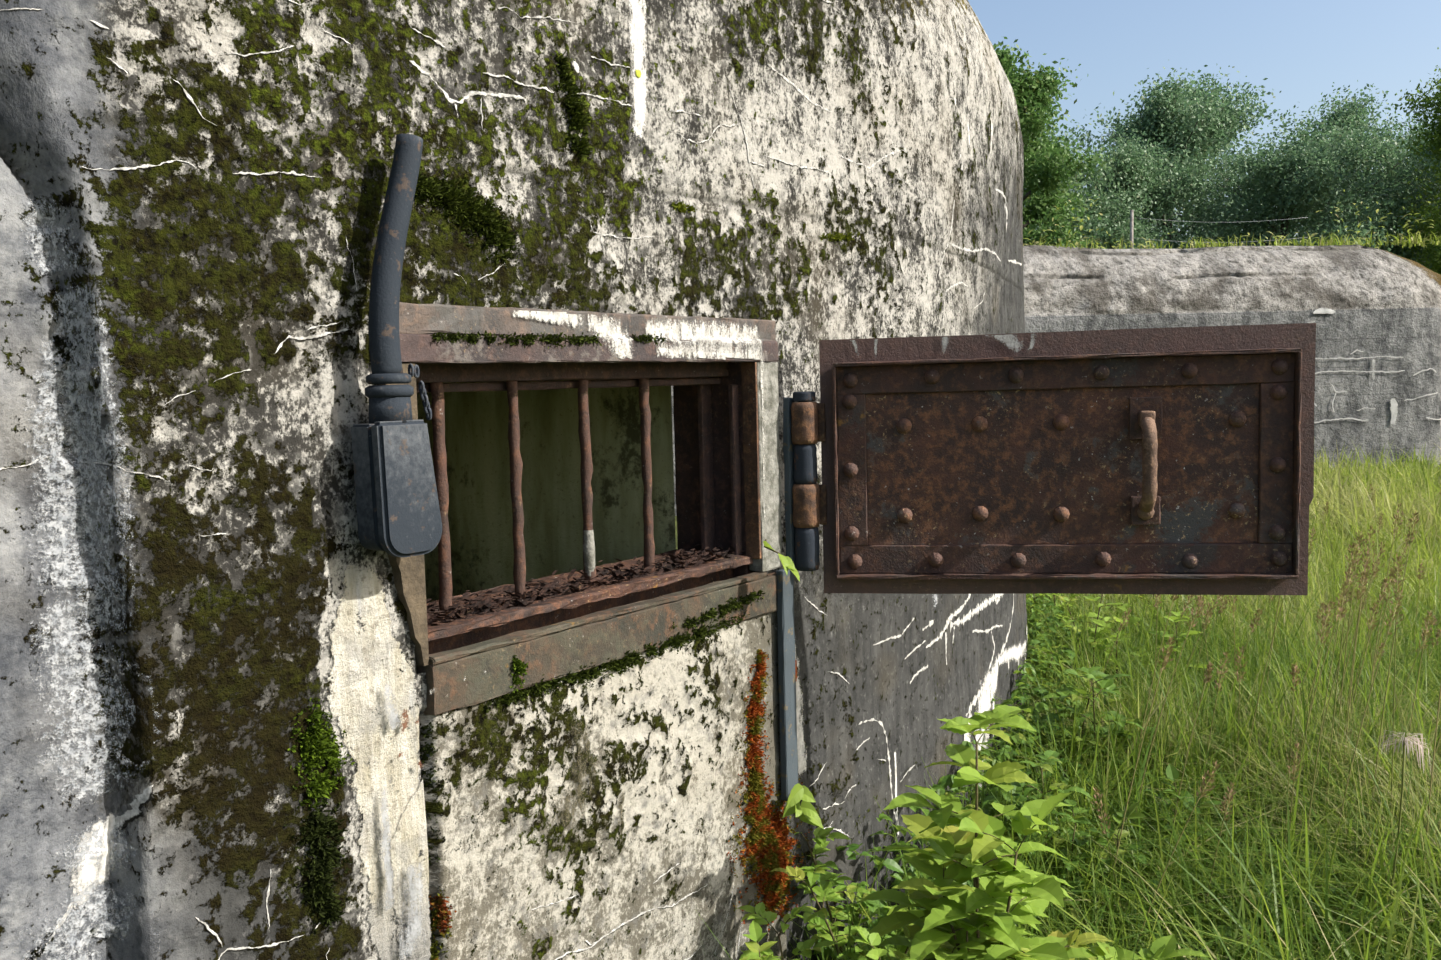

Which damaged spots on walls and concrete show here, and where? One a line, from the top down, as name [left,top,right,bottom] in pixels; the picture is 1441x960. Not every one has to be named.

crack [410,28,632,127]
water stain [629,0,648,138]
crack [82,160,196,171]
crack [233,170,323,178]
water stain [513,310,765,478]
corrosion [426,542,746,624]
water stain [384,684,400,730]
crack [874,594,1014,717]
water stain [559,722,596,826]
crack [809,718,915,837]
crack [195,869,330,960]
water stain [381,790,425,958]